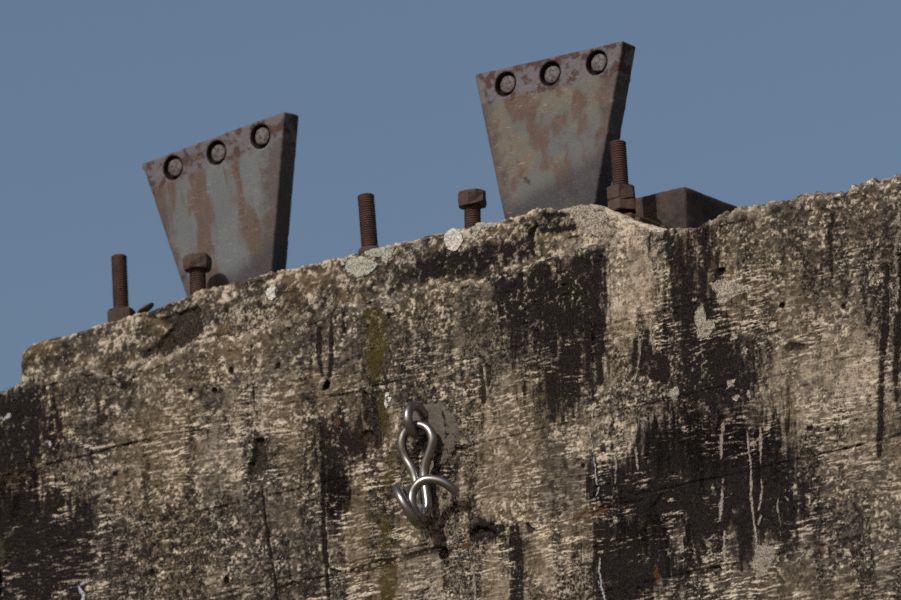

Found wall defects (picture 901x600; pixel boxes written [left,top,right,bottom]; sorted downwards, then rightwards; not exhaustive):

leakage [433,444,467,479]
leakage [468,518,529,600]
leakage [409,211,611,422]
leakage [580,221,820,600]
leakage [876,202,901,457]